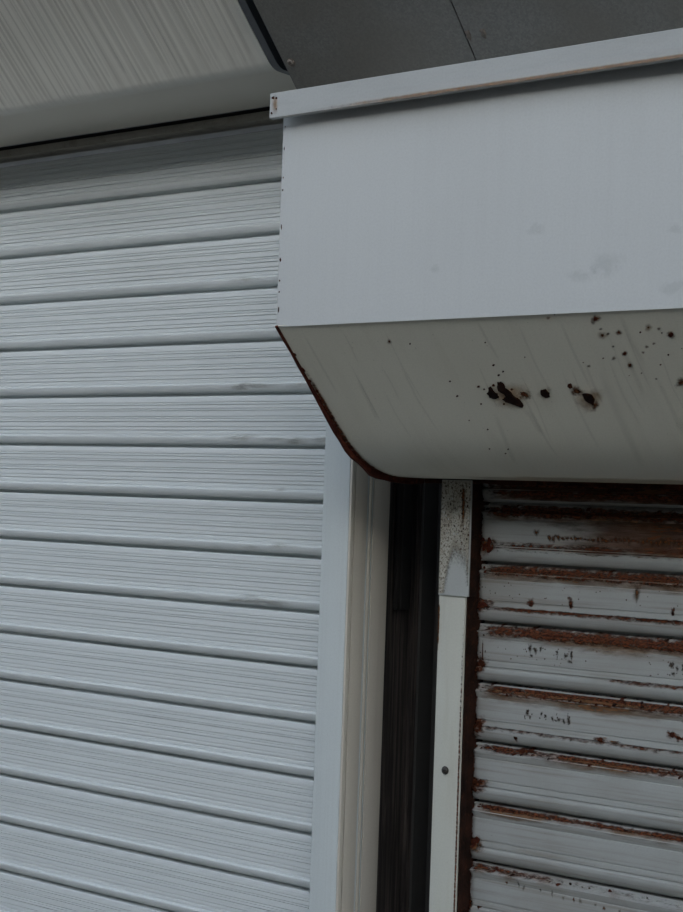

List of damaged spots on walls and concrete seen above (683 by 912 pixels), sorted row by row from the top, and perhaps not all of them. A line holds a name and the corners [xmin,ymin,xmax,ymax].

rust [302,367,424,479]
rust [477,364,529,408]
rust [567,383,598,410]
rust [468,480,683,912]
rust [453,676,462,912]